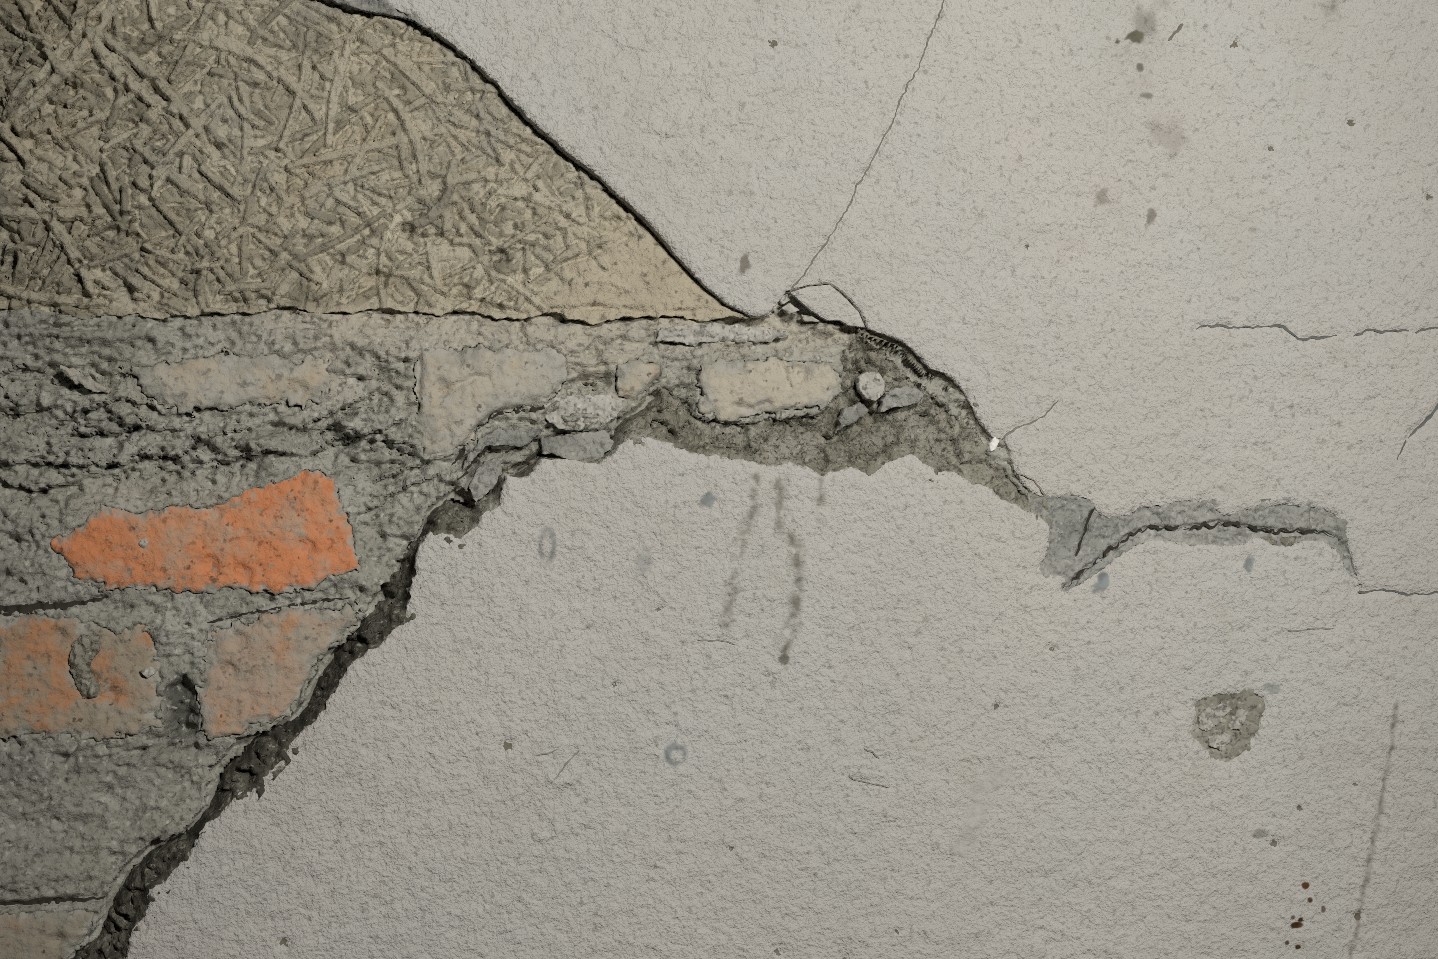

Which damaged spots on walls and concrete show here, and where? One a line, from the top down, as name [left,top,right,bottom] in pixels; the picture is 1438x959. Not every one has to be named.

crack [790,0,945,306]
crack [1197,323,1438,341]
spalling [0,0,1049,959]
spalling [1027,492,1354,592]
peeling [1190,688,1265,762]